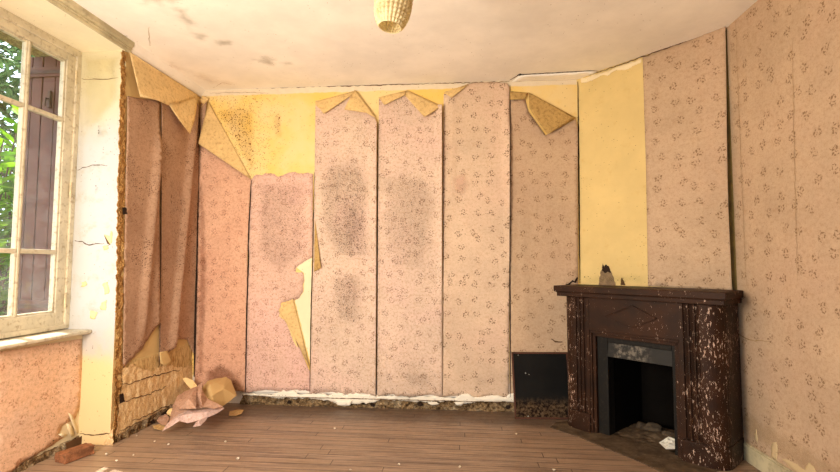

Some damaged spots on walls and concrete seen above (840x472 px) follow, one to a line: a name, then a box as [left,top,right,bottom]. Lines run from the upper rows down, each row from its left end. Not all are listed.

peeling [580,59,641,83]
spalling [90,50,193,445]
water stain [319,162,368,257]
peeling [771,442,817,472]